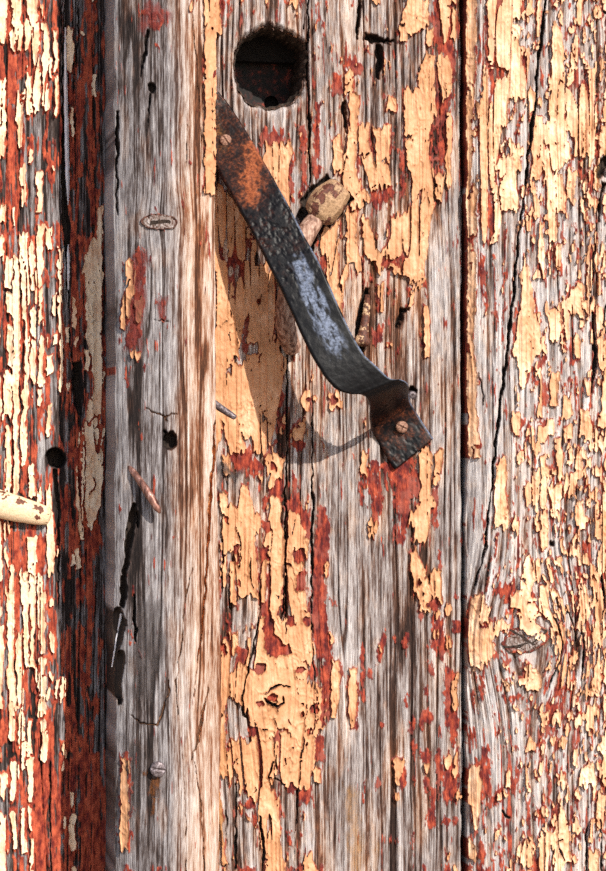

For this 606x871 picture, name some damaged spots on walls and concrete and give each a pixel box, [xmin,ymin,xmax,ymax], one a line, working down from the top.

peeling [120,258,142,330]
crack [474,0,546,587]
peeling [0,0,105,871]
crack [113,503,178,726]
crack [179,420,253,660]
peeling [203,0,358,871]
crack [281,354,289,627]
crack [308,408,316,632]
peeling [320,0,606,871]
peeling [119,758,130,853]
crack [185,688,238,871]
crack [258,815,266,870]